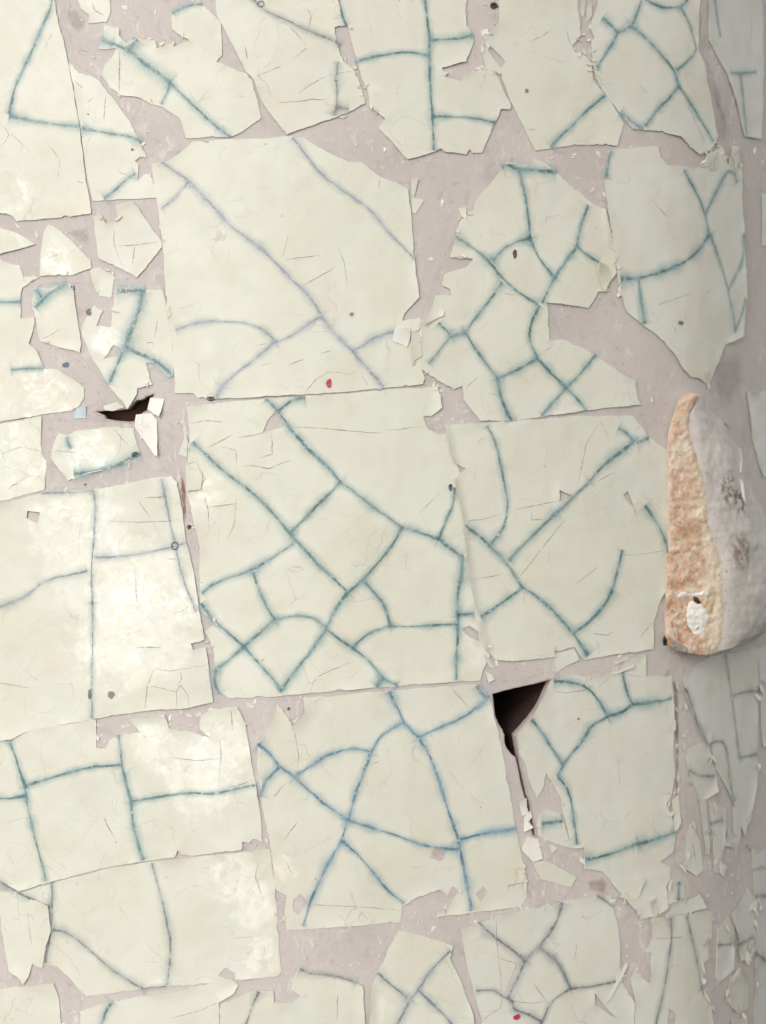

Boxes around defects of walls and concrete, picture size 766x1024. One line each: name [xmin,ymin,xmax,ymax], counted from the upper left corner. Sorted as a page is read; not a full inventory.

crack [7,0,141,155]
peeling [64,0,212,79]
peeling [116,93,209,169]
crack [253,0,495,150]
peeling [445,0,505,79]
crack [550,0,714,148]
peeling [0,202,165,291]
crack [620,170,746,332]
peeling [44,392,215,556]
crack [0,162,648,1024]
peeling [277,636,763,1017]
crack [531,662,758,862]